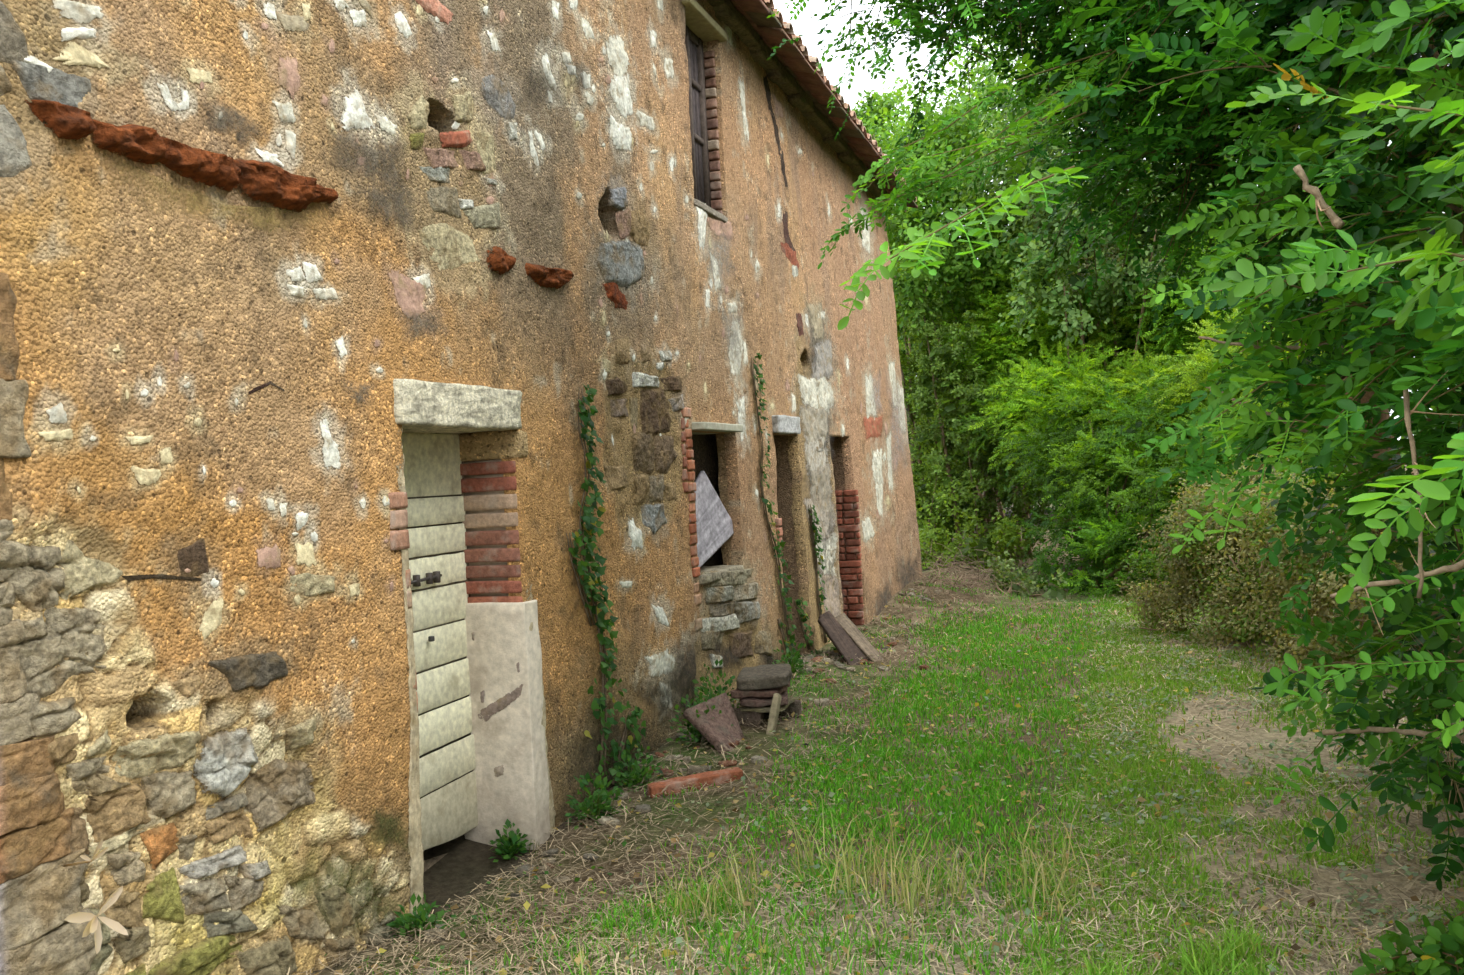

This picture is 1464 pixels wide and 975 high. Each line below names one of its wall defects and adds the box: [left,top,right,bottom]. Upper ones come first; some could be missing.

peeling [482,0,505,52]
crack [763,76,799,278]
spalling [542,0,701,552]
crack [796,313,804,336]
peeling [125,376,162,399]
peeling [354,484,390,509]
peeling [256,497,360,605]
spalling [0,538,400,975]